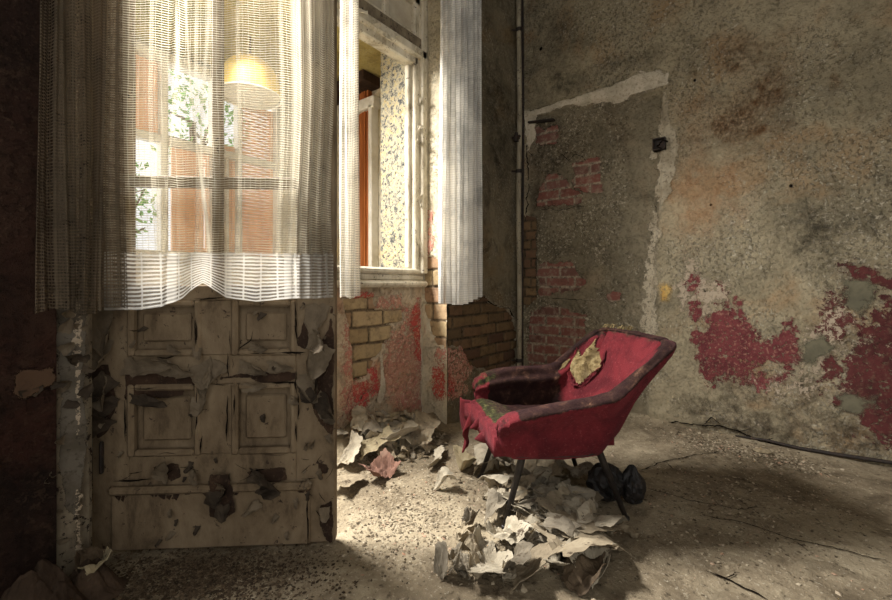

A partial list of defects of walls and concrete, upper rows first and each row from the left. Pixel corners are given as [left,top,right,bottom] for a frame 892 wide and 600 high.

peeling [13,295,336,547]
flaking render [343,183,516,414]
flaking render [523,69,679,335]
peeling [672,244,892,450]